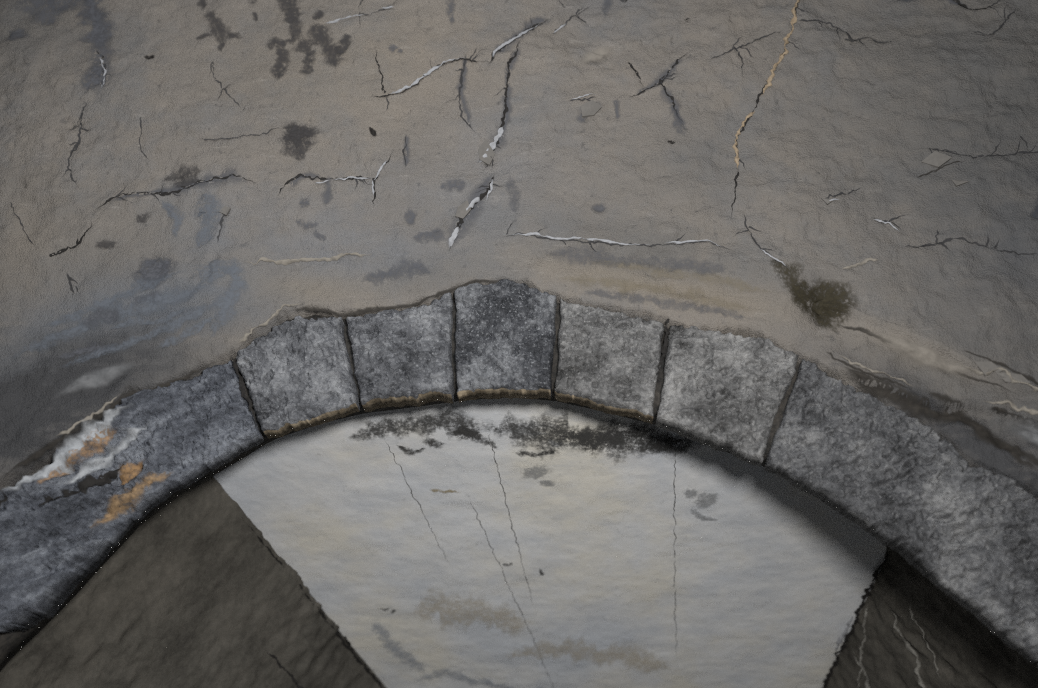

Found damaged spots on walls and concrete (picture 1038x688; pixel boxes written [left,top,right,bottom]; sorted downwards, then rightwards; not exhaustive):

water stain [196,0,238,50]
water stain [268,0,350,77]
crack [279,136,408,204]
crack [375,0,587,246]
crack [506,0,888,267]
crack [11,174,250,296]
crack [875,215,1035,255]
water stain [772,261,854,327]
flaking render [14,391,138,468]
corrosion [38,430,114,483]
corrosion [97,462,166,522]
water stain [352,409,697,486]